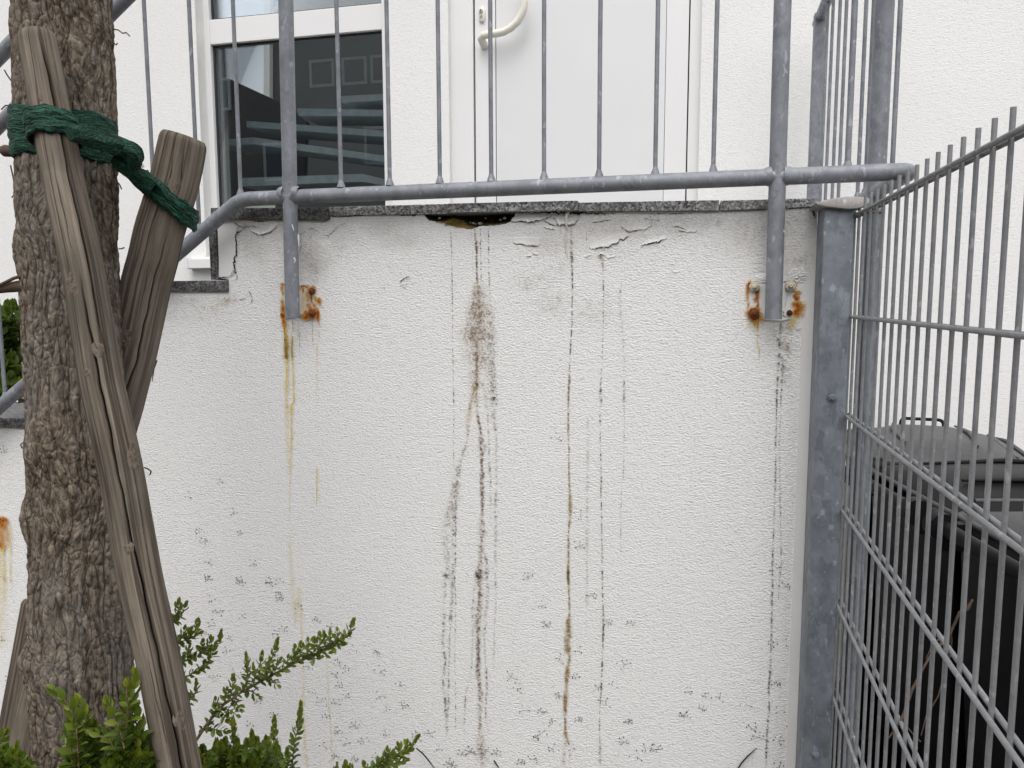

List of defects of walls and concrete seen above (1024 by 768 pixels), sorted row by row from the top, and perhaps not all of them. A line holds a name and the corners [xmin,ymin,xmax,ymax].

crack [219,221,264,303]
spalling [425,214,578,258]
peeling [584,219,697,259]
damp [565,212,573,400]
corrosion [745,281,763,354]
corrosion [782,281,805,328]
corrosion [280,283,321,473]
damp [442,229,497,758]
corrosion [0,516,11,574]
damp [765,324,791,763]
damp [563,466,572,756]